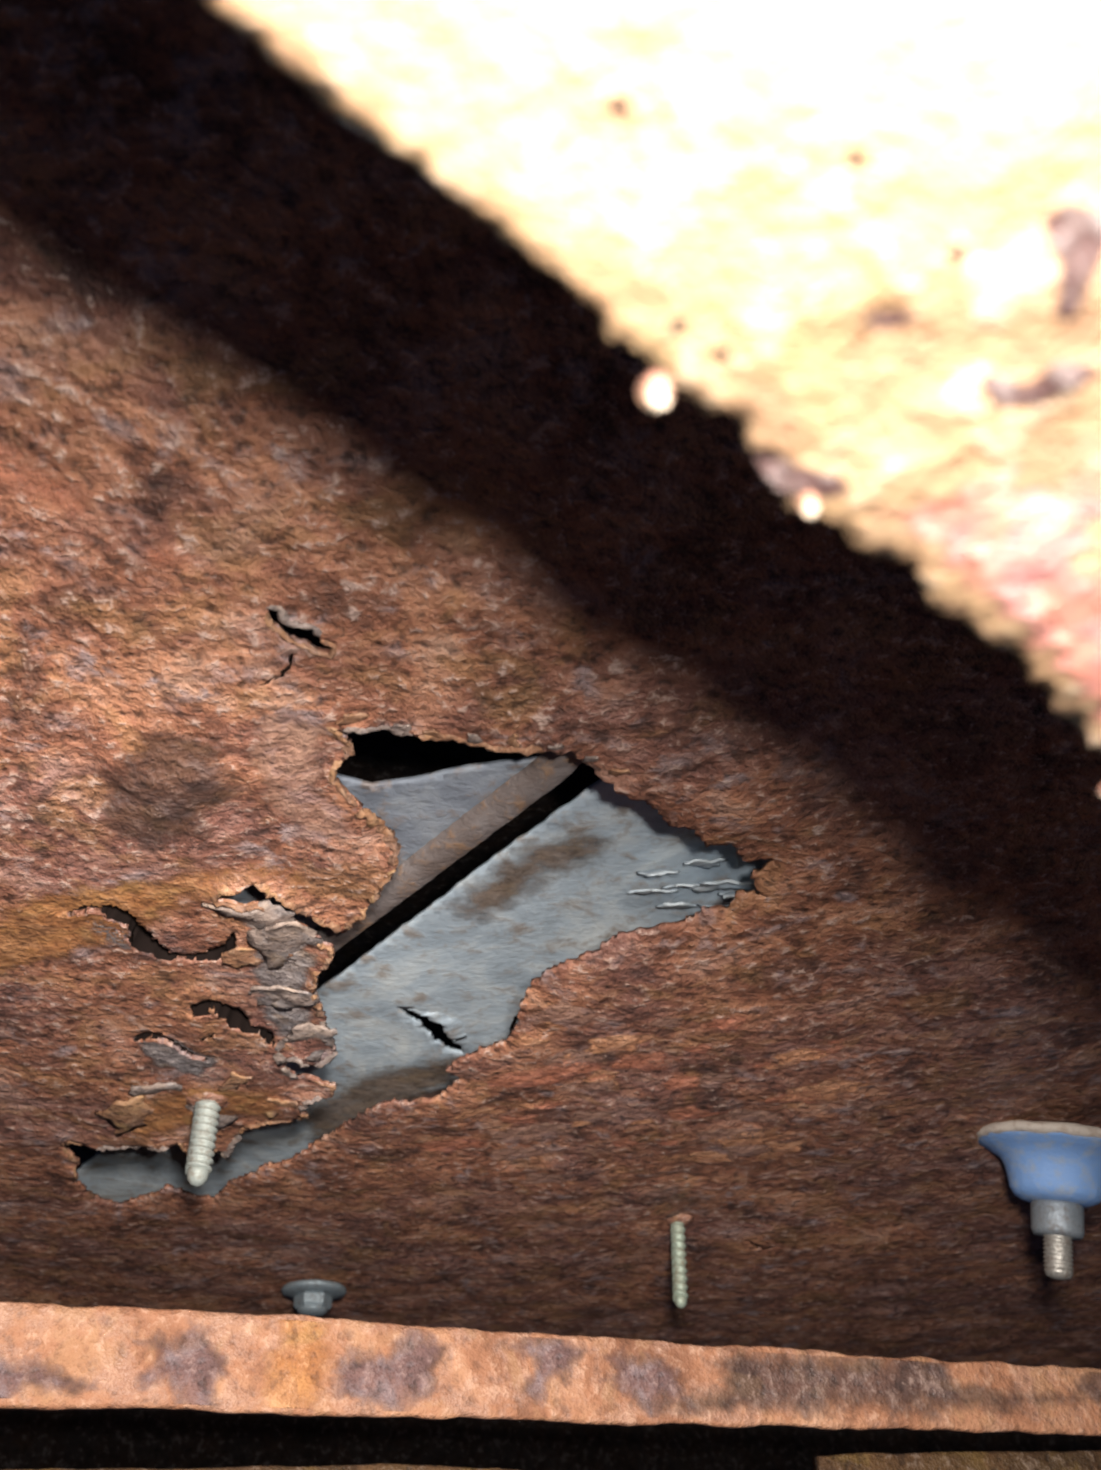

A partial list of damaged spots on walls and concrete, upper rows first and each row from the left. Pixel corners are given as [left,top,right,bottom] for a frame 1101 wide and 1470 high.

rust [1041,200,1101,320]
rust [979,361,1099,407]
rust [756,455,849,498]
rust [897,472,1101,720]
crack [264,633,296,685]
rust [459,837,601,915]
rust [628,858,759,909]
rust [0,874,338,1067]
crack [407,1009,470,1049]
crack [508,1014,518,1036]
rust [94,1041,458,1140]
rust [416,1002,893,1184]